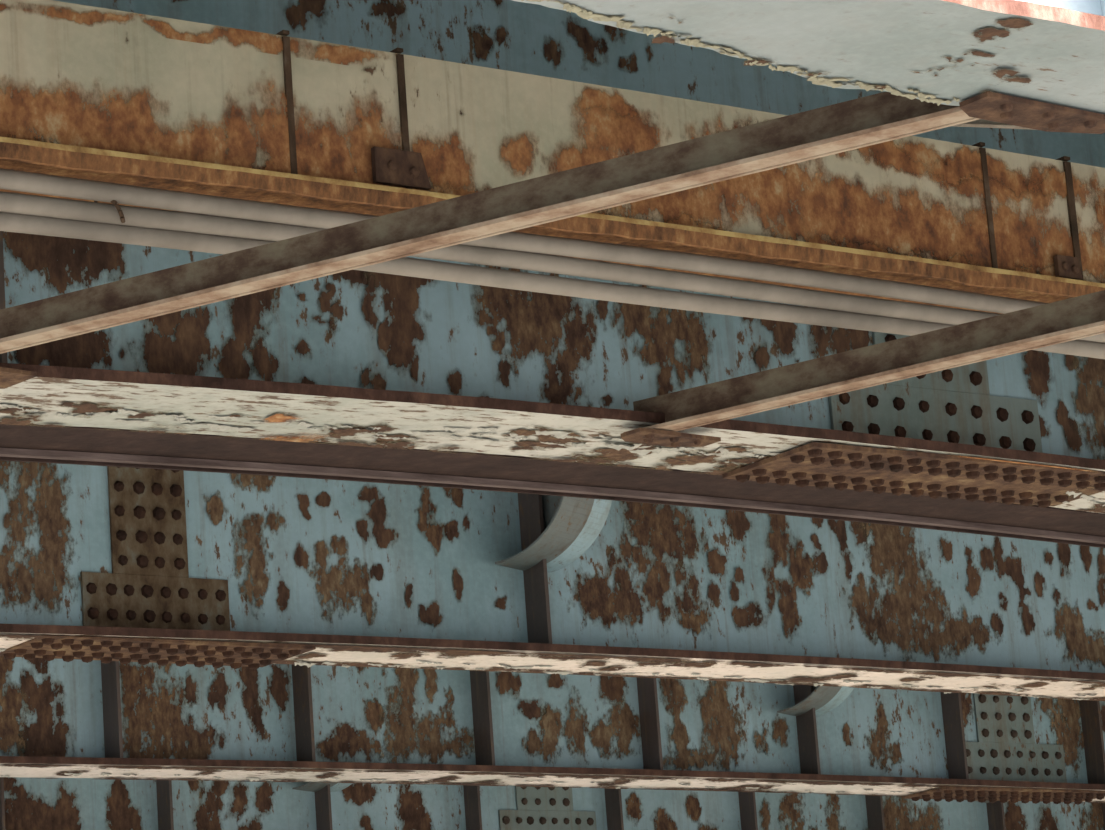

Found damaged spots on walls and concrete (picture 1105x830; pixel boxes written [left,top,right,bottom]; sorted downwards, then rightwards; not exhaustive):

peeling [521,0,960,106]
corrosion [0,81,490,196]
corrosion [3,231,125,294]
corrosion [591,140,1105,284]
corrosion [14,288,279,381]
corrosion [313,270,433,390]
corrosion [475,285,709,407]
peeling [0,403,783,464]
peeling [1062,491,1105,506]
peeling [294,659,351,668]
peeling [499,664,571,675]
corrosion [0,486,1105,830]